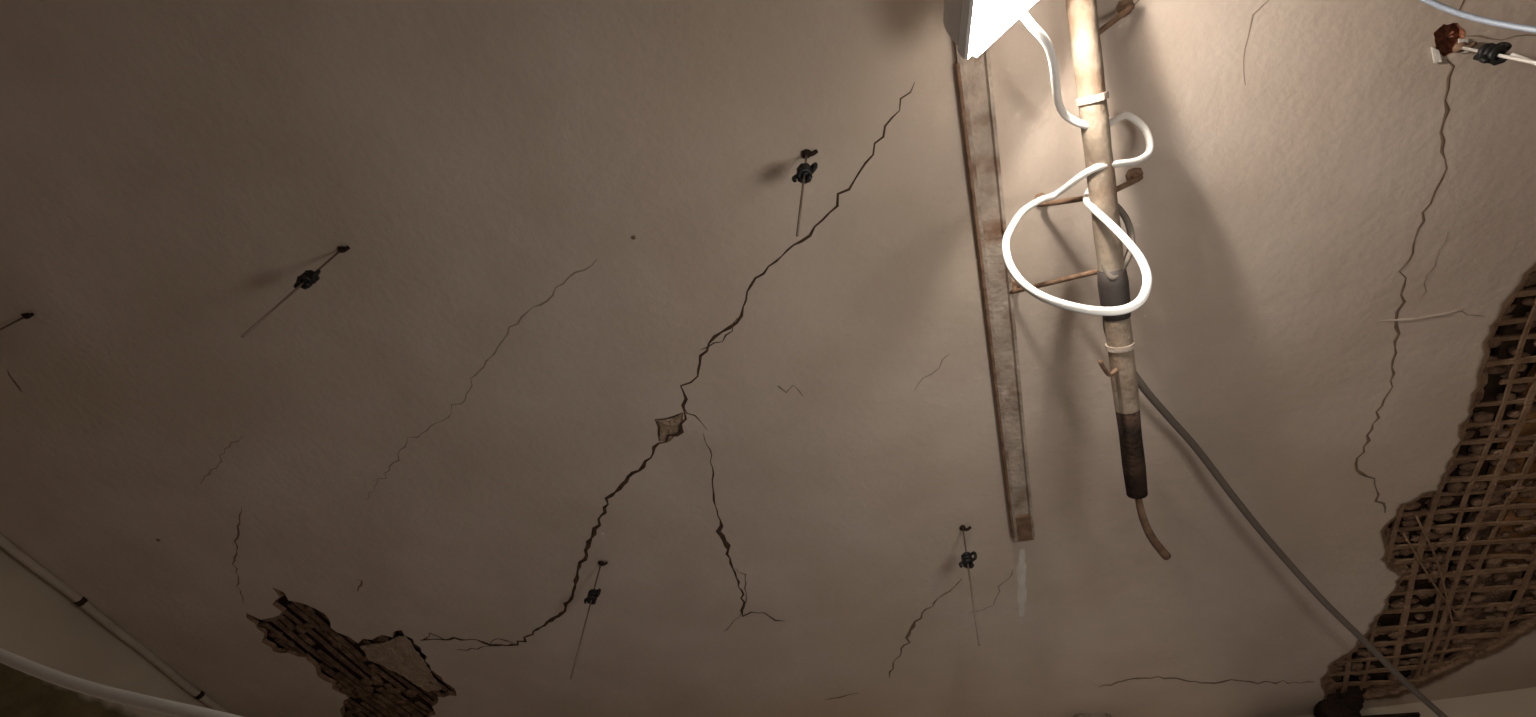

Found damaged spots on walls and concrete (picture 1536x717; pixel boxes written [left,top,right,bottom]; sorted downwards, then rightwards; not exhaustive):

crack [1243,0,1269,85]
spalling [1431,23,1468,63]
crack [366,259,597,500]
crack [421,82,915,651]
spalling [1321,264,1536,700]
crack [1354,0,1536,513]
spalling [246,587,456,717]